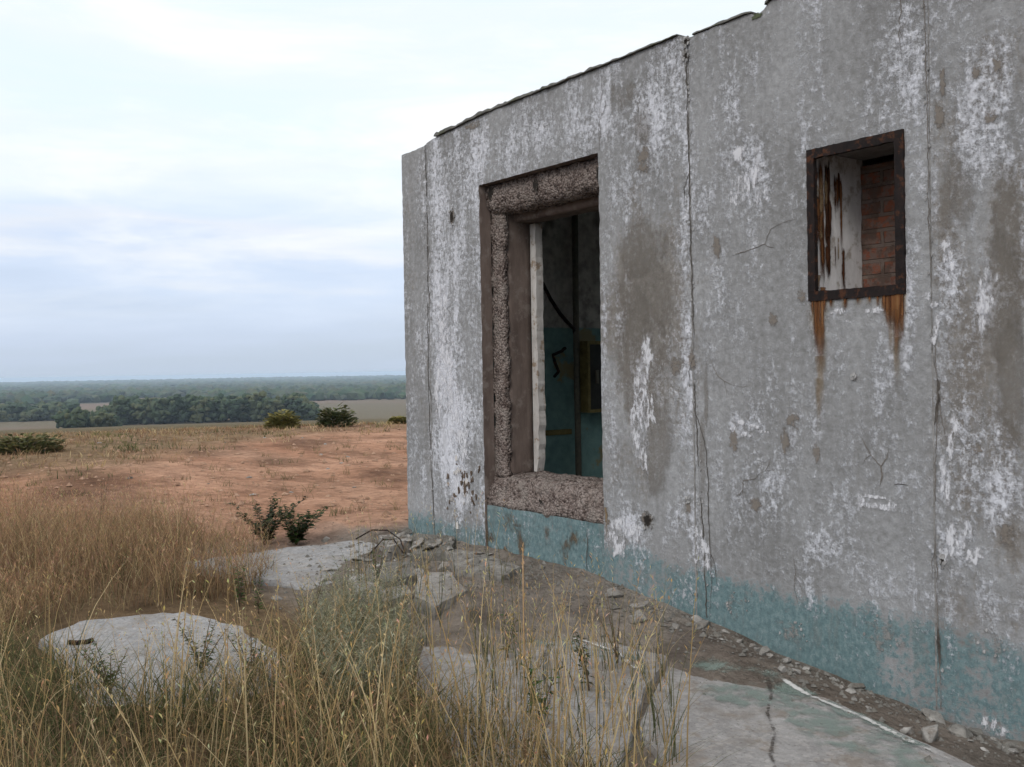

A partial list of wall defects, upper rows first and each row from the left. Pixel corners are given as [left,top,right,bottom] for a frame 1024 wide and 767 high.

rust [811,160,904,347]